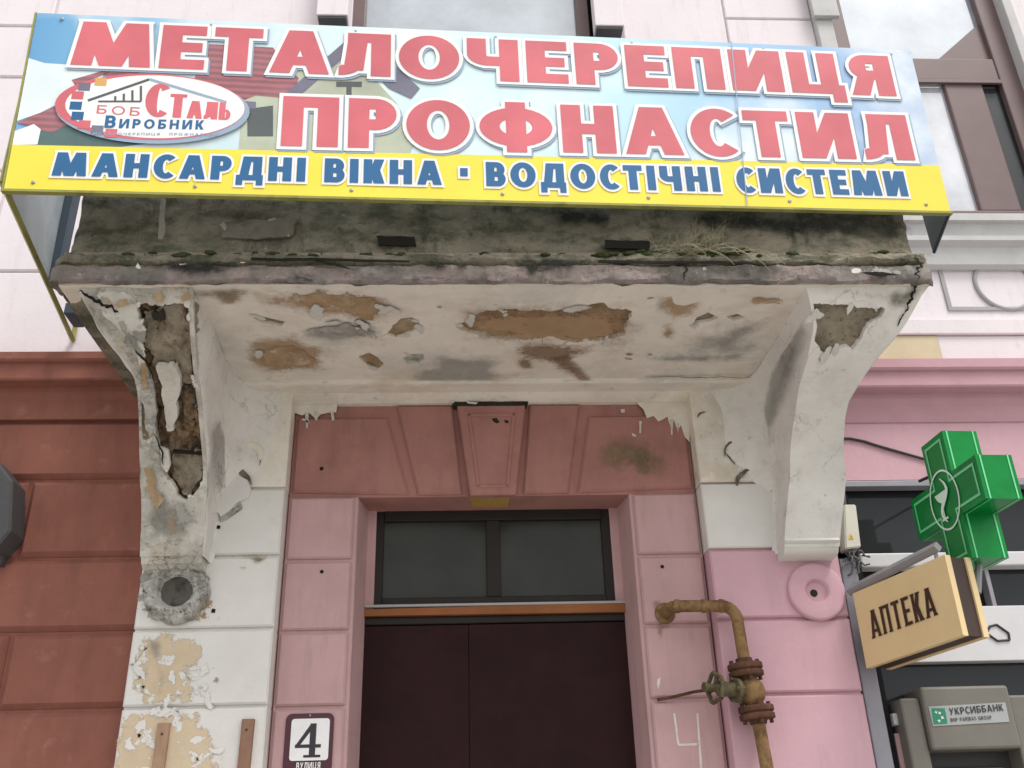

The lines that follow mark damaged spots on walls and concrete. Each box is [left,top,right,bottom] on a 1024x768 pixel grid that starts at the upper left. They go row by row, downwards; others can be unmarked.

leakage [559,210,609,226]
leakage [698,215,904,234]
leakage [521,258,586,273]
crack [79,290,118,313]
crack [897,256,923,327]
peeling [251,290,424,372]
spalling [456,303,631,347]
spalling [806,302,882,365]
crack [135,350,154,380]
flaking render [97,290,203,525]
peeling [632,403,690,442]
peeling [115,572,224,768]